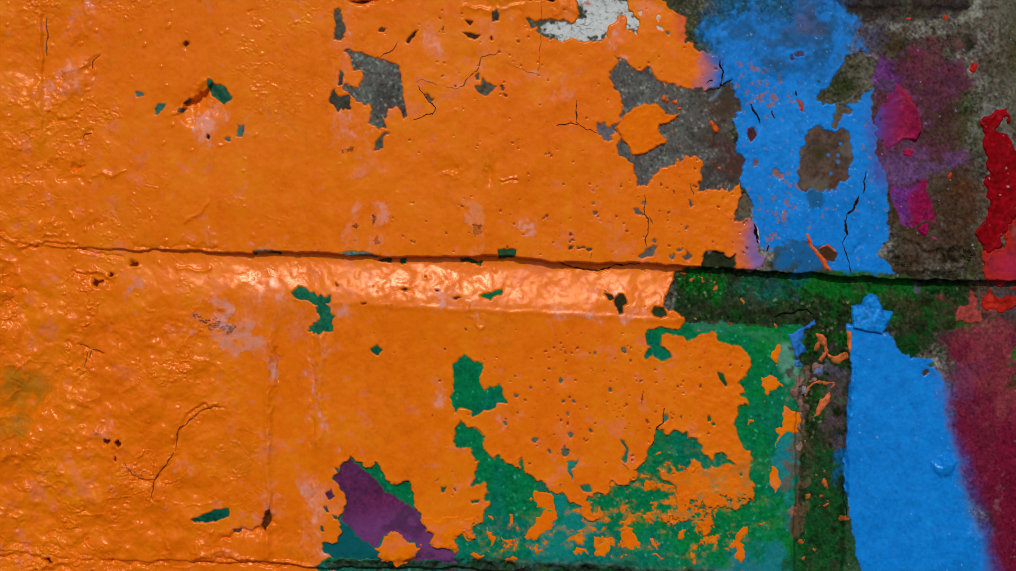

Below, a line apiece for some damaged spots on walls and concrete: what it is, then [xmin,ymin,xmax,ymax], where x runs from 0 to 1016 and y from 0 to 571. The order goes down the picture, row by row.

peeling [334,9,346,40]
peeling [526,0,642,42]
spalling [207,79,232,104]
peeling [330,50,436,150]
peeling [475,74,507,97]
peeling [597,58,758,221]
peeling [797,52,921,192]
crack [842,171,867,272]
peeling [681,251,735,290]
peeling [806,233,837,270]
peeling [292,284,338,334]
peeling [321,293,893,571]